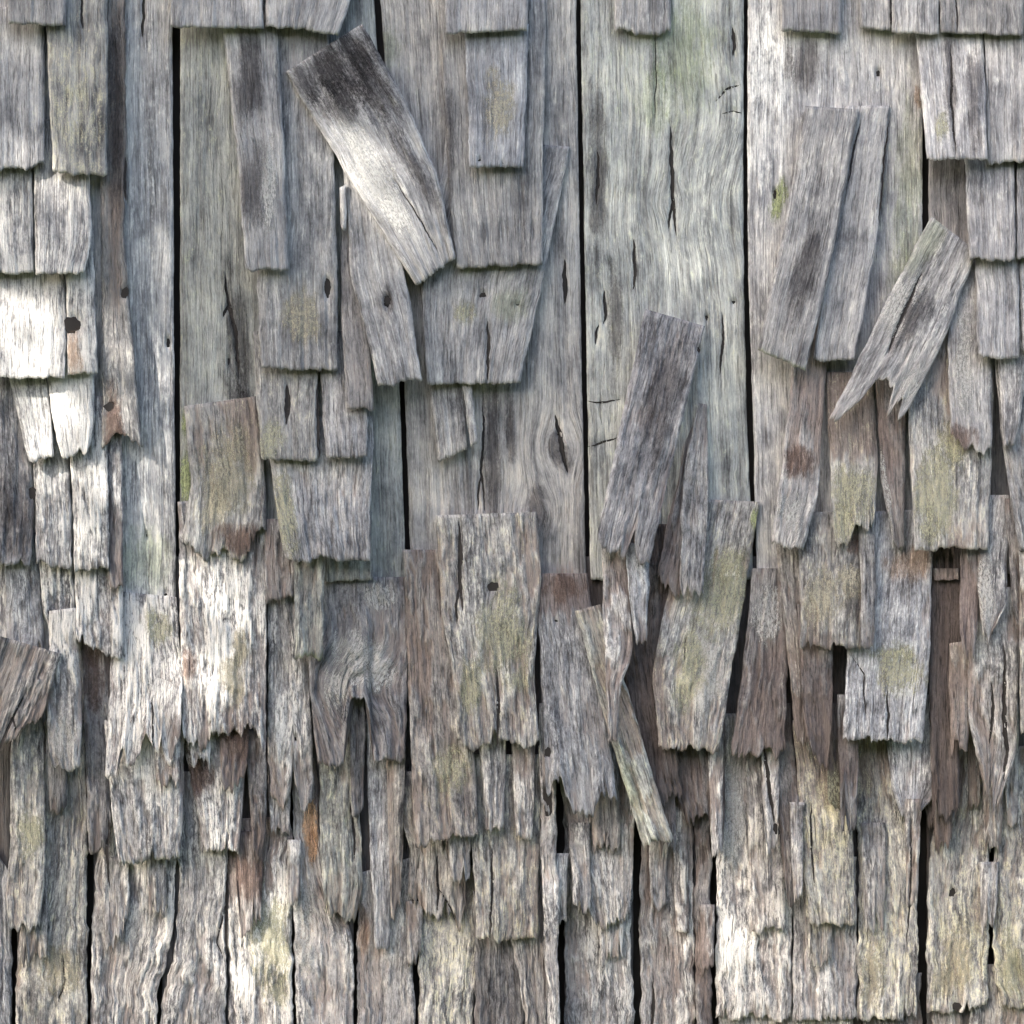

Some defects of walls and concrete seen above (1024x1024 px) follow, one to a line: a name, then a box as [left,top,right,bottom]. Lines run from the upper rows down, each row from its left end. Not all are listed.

crack [654,35,676,233]
crack [484,322,492,379]
crack [555,415,616,472]
damp [691,628,721,714]